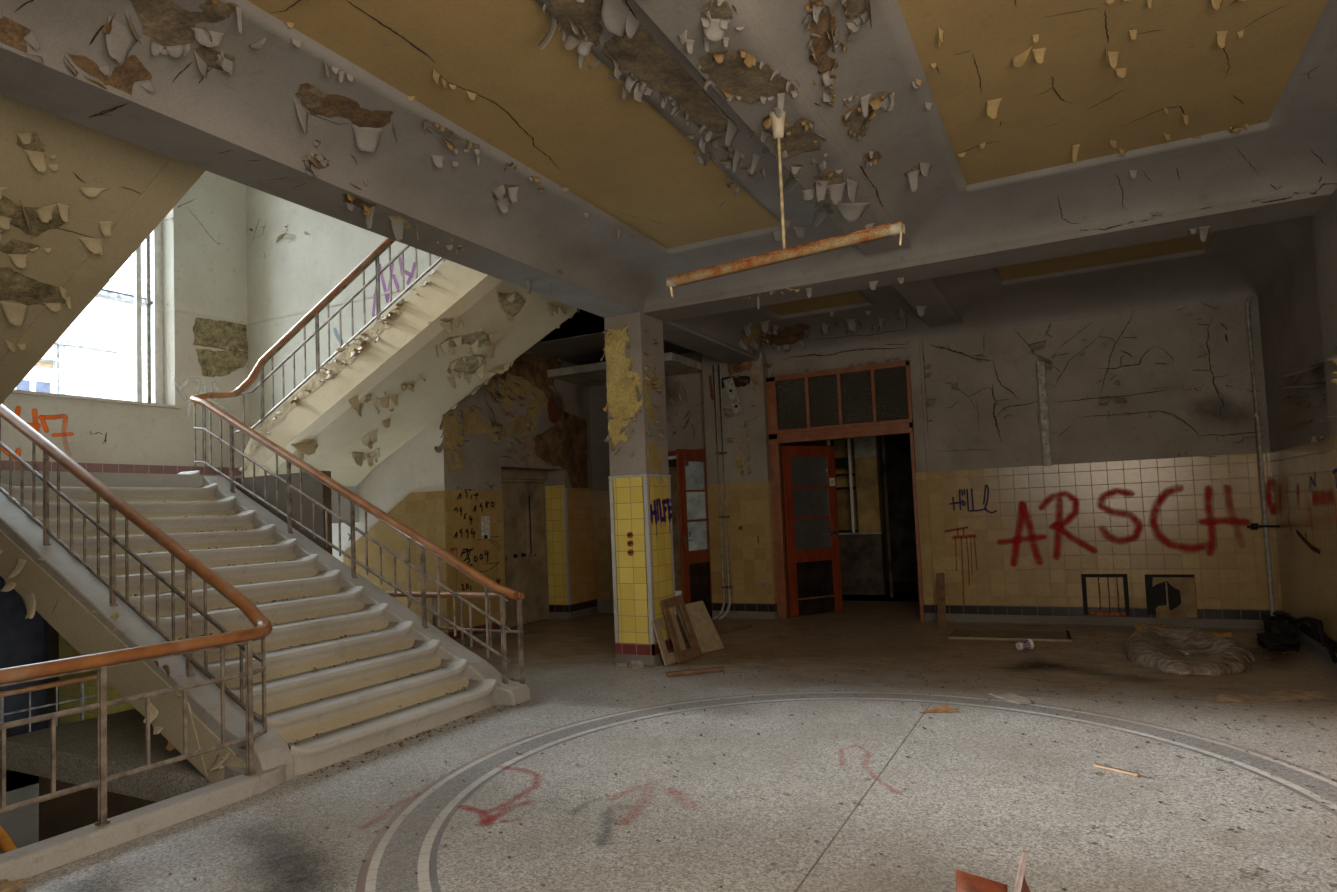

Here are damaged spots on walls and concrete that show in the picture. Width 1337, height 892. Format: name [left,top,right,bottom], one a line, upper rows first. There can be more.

peeling [0,0,44,63]
peeling [15,132,60,172]
peeling [0,187,113,326]
peeling [64,0,267,95]
crack [346,0,560,170]
peeling [491,162,544,214]
peeling [538,0,895,241]
crack [1031,77,1184,128]
crack [1047,8,1190,48]
flaking render [238,270,437,472]
peeling [601,287,927,483]
crack [784,302,1264,457]